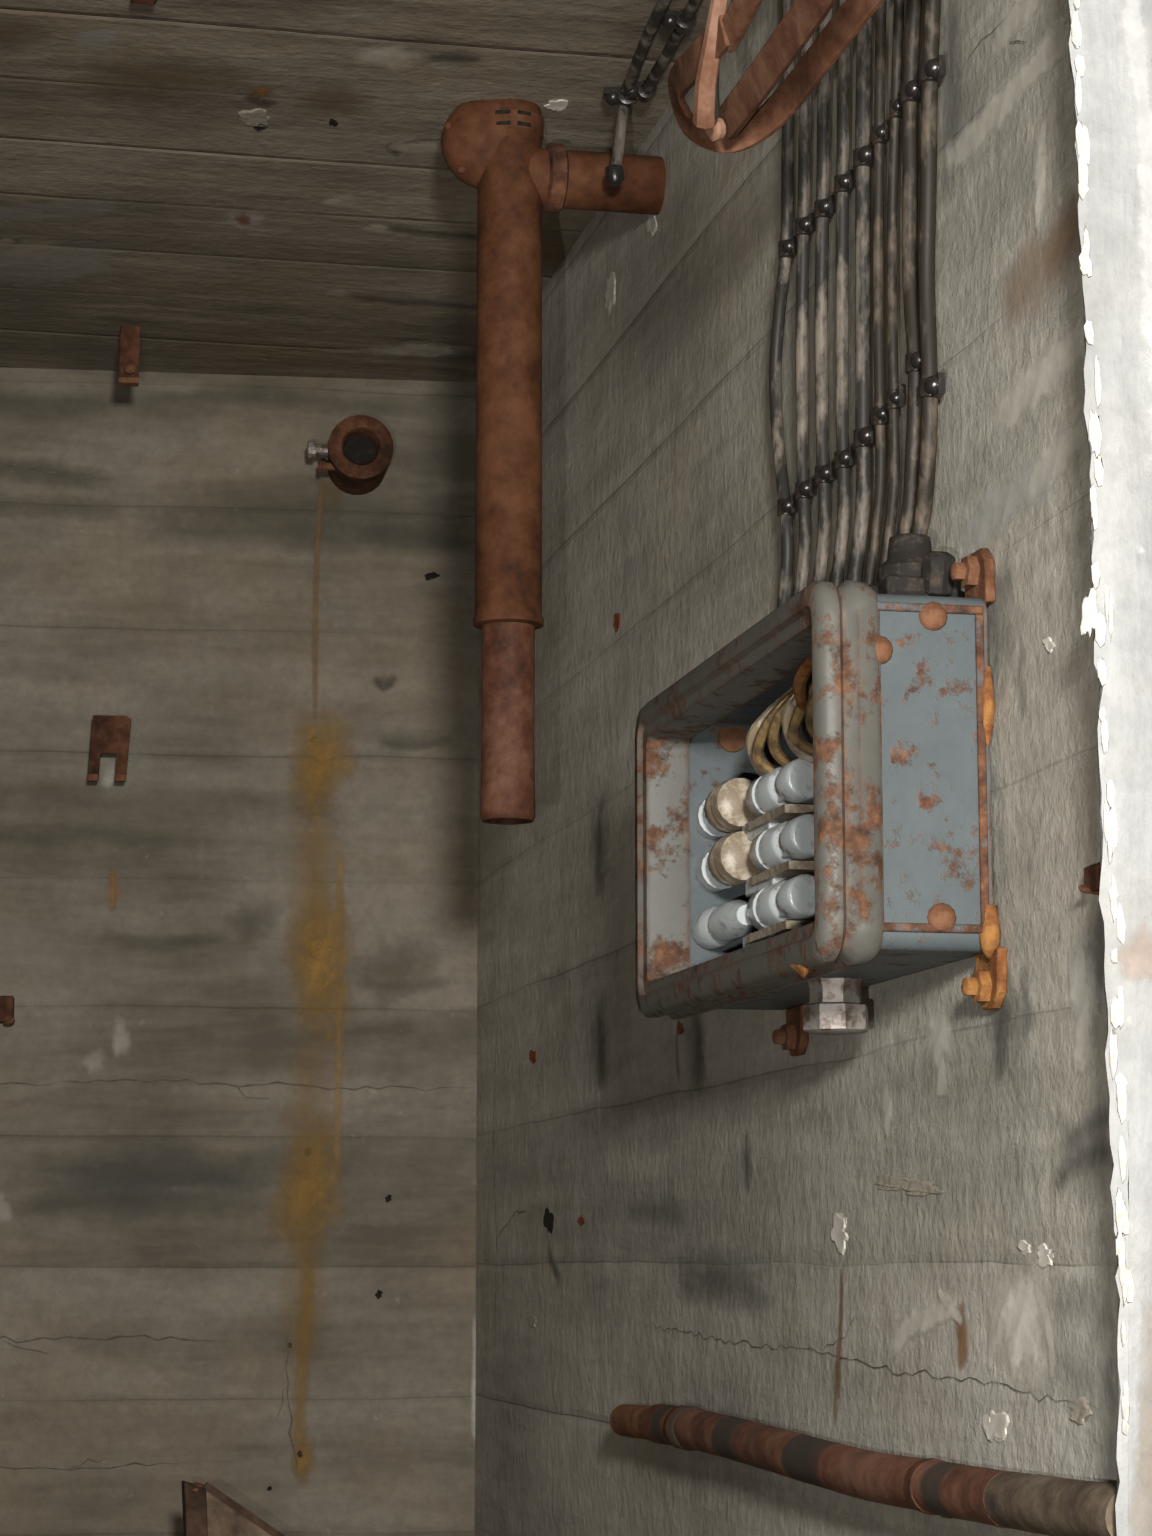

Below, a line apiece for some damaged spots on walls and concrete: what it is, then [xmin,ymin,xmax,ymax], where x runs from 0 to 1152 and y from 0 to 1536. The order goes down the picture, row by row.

rust [834,1274,843,1419]